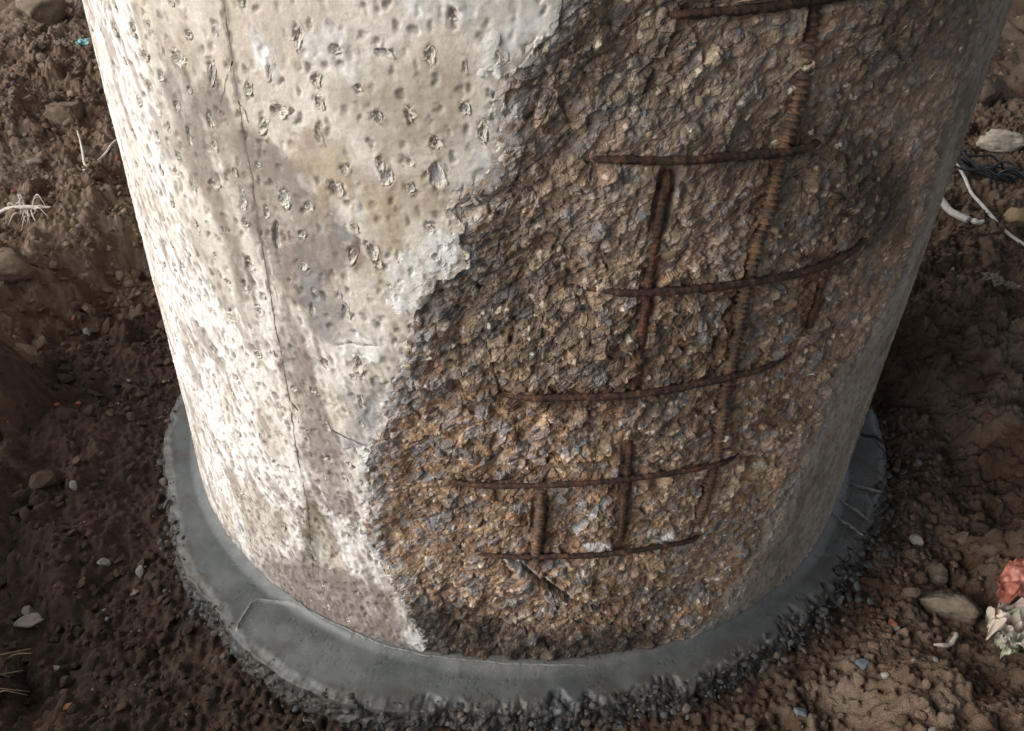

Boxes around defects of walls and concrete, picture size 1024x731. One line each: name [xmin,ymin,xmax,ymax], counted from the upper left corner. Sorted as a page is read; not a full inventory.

spalling [143,300,332,716]
crack [220,0,319,574]
spalling [406,700,541,731]
spalling [343,0,978,661]
spalling [550,423,911,731]